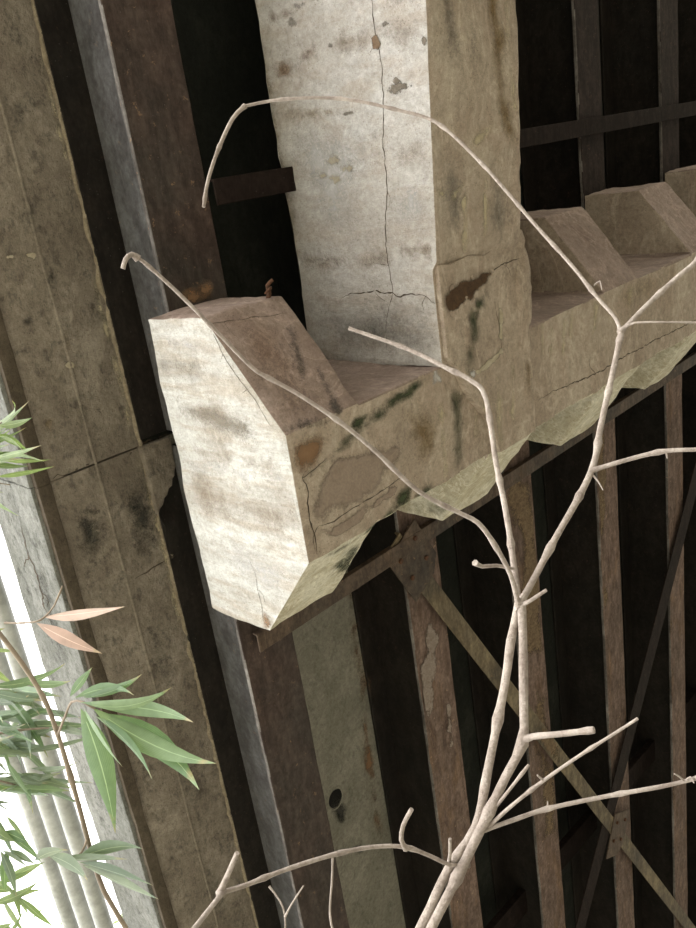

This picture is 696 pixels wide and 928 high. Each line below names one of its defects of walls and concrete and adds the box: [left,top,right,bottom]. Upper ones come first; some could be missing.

crack [344,3,434,345]
rust [296,439,322,469]
crack [302,458,407,551]
peeling [420,624,439,717]